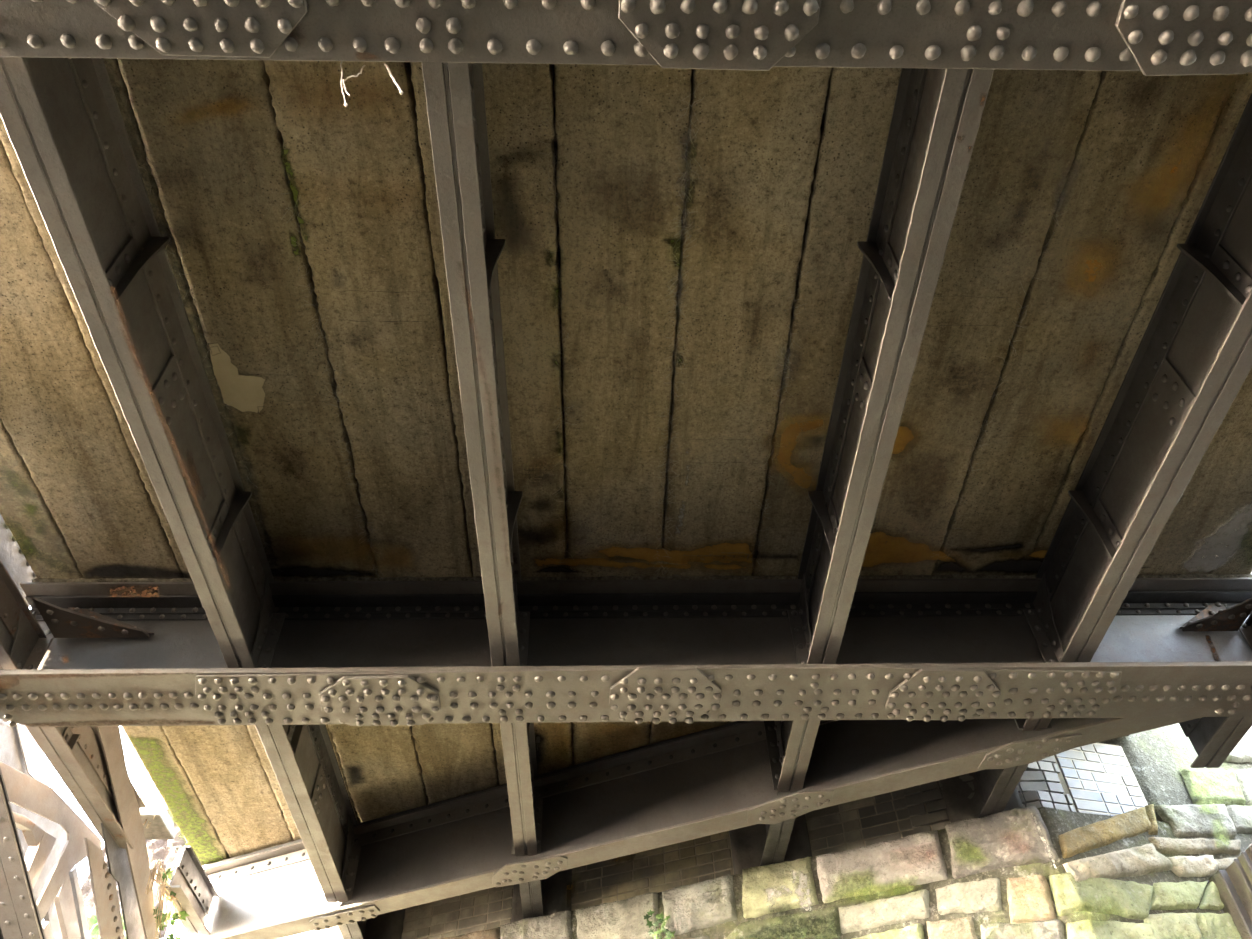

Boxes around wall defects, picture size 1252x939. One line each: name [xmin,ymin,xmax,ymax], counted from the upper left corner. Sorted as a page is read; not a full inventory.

rust [1206,635,1219,661]